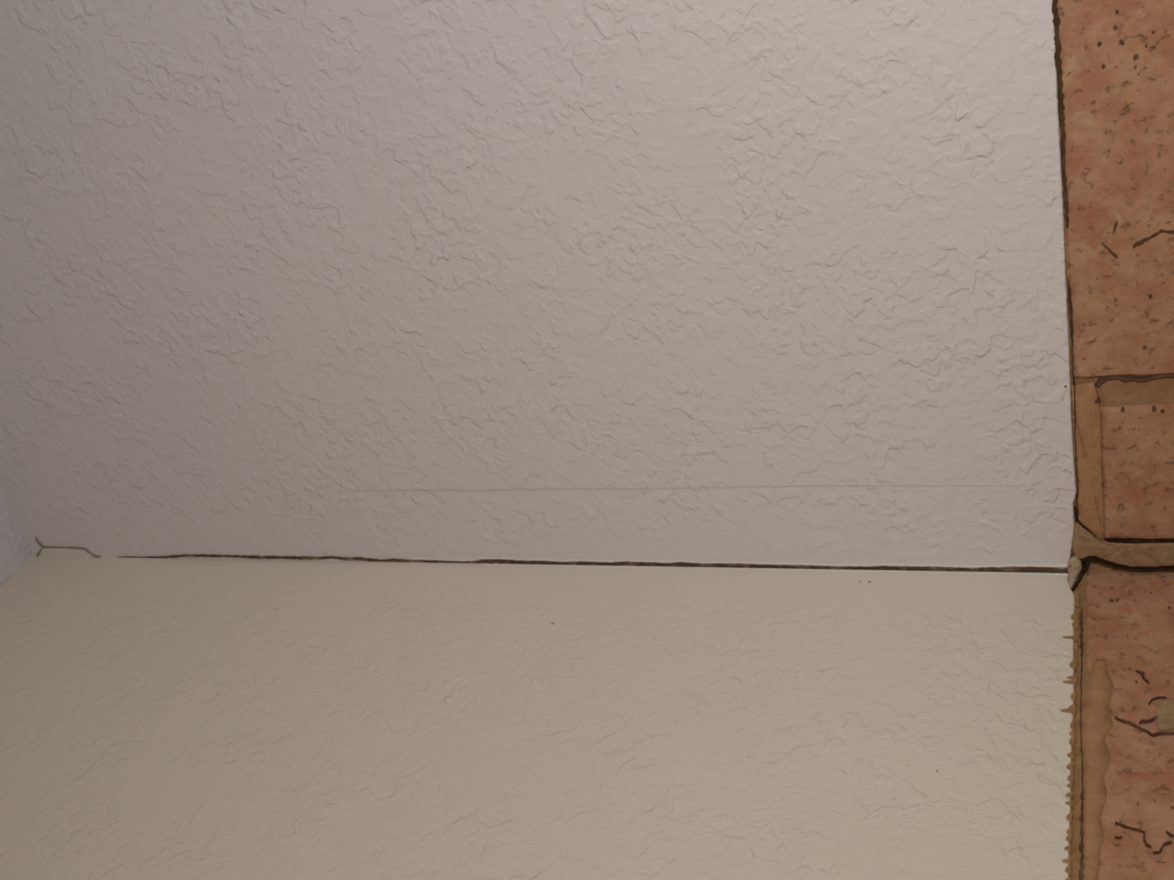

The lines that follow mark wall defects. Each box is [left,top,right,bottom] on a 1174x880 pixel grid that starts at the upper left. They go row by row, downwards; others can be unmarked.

crack [122,280,1174,880]